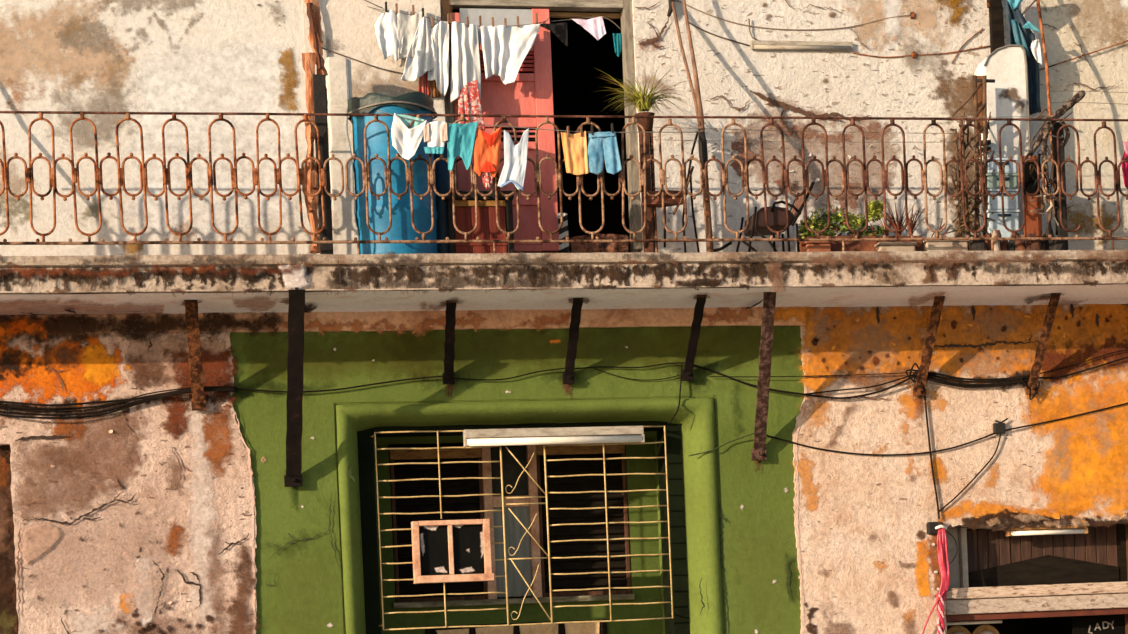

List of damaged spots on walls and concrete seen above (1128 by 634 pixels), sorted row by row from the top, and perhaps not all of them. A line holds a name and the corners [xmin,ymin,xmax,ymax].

water stain [57,19,119,58]
water stain [105,0,202,50]
water stain [924,204,1128,283]
corrosion [1026,294,1078,304]
water stain [0,253,314,634]
peeling [761,304,1128,634]
crack [16,477,136,628]
crack [152,561,202,616]